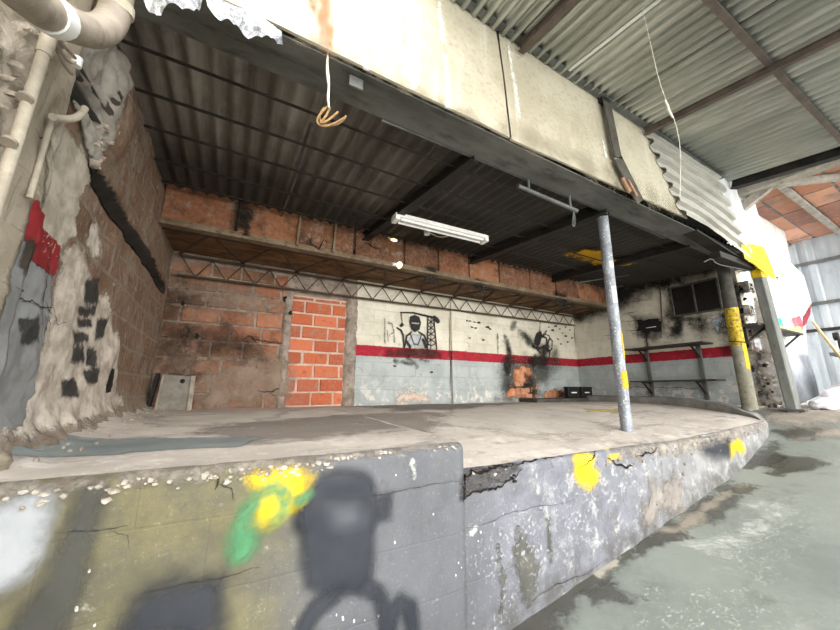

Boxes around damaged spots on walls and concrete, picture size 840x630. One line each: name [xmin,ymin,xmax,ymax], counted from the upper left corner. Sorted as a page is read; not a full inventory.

spalling [0,11,40,135]
peeling [0,45,134,440]
peeling [395,390,430,403]
spalling [506,365,565,398]
spalling [460,462,521,503]
crack [477,447,658,470]
water stain [687,480,758,522]
water stain [742,428,832,477]
water stain [497,544,506,612]
water stain [512,520,688,630]